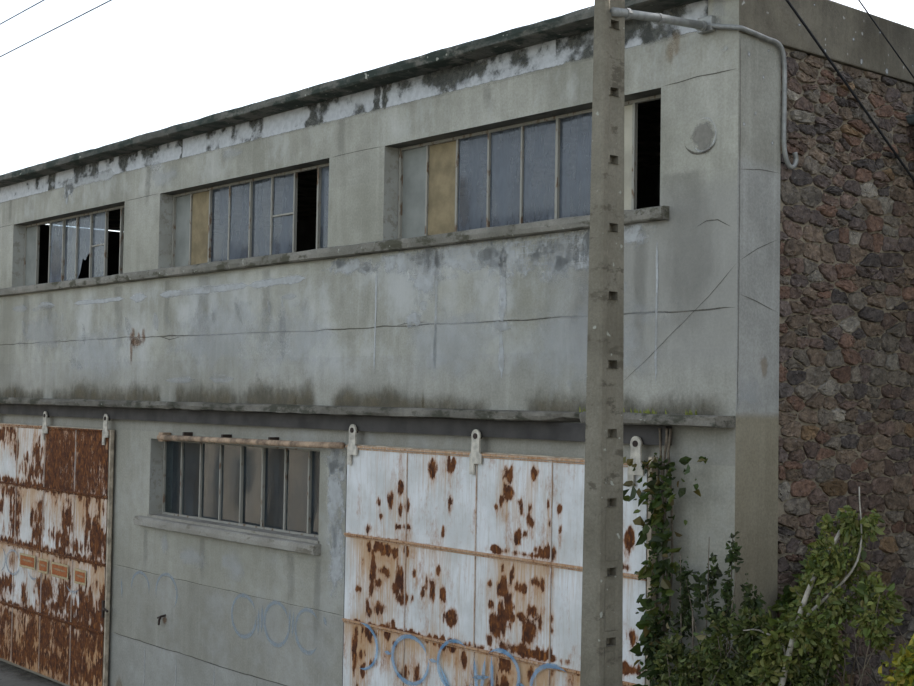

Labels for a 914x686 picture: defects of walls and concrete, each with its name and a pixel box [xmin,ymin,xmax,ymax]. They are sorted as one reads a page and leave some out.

water stain [556,30,594,60]
peeling [625,29,642,48]
water stain [625,5,686,45]
peeling [650,0,708,39]
water stain [422,48,528,92]
peeling [0,30,594,203]
water stain [305,98,339,127]
water stain [355,80,411,114]